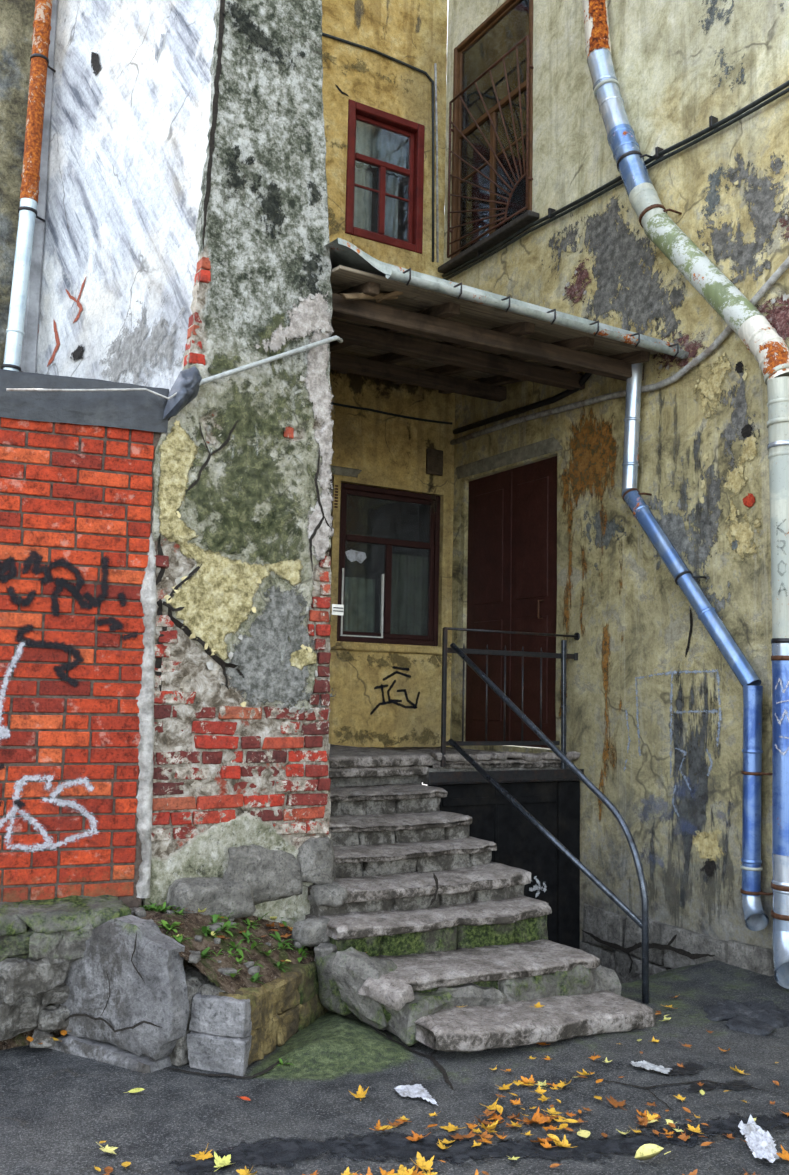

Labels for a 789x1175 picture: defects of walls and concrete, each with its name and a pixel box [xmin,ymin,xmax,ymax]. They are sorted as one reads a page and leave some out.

corrosion [588,0,610,53]
peeling [697,151,789,294]
spalling [757,291,789,340]
peeling [542,187,761,621]
spalling [151,291,336,859]
crack [309,448,331,572]
corrosion [561,406,620,669]
leakage [642,669,742,926]
crack [582,930,715,973]